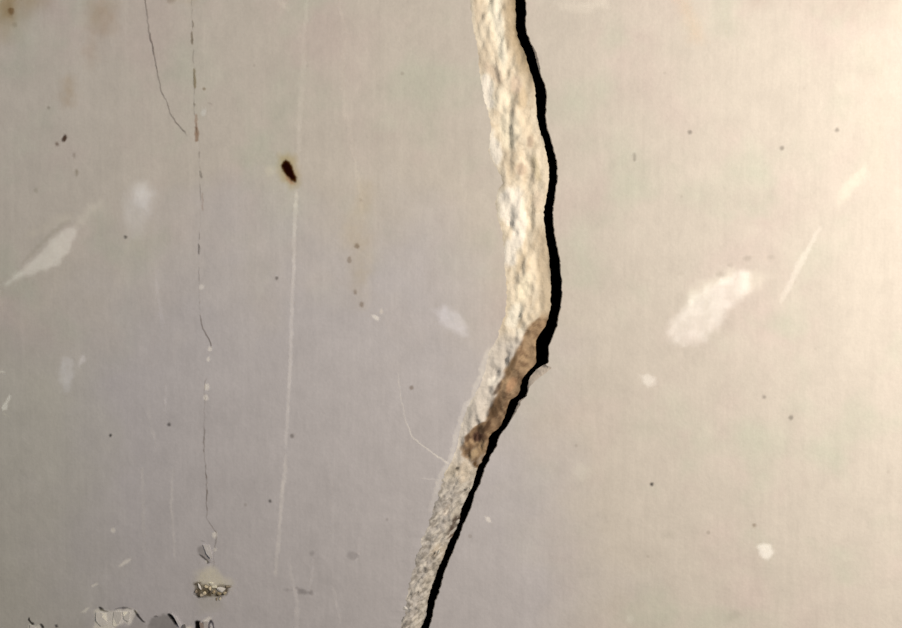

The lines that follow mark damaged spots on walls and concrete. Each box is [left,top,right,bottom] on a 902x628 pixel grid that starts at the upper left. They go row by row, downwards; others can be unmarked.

rust [282,160,296,182]
crack [401,0,563,628]
spalling [194,582,230,601]
peeling [168,613,213,628]